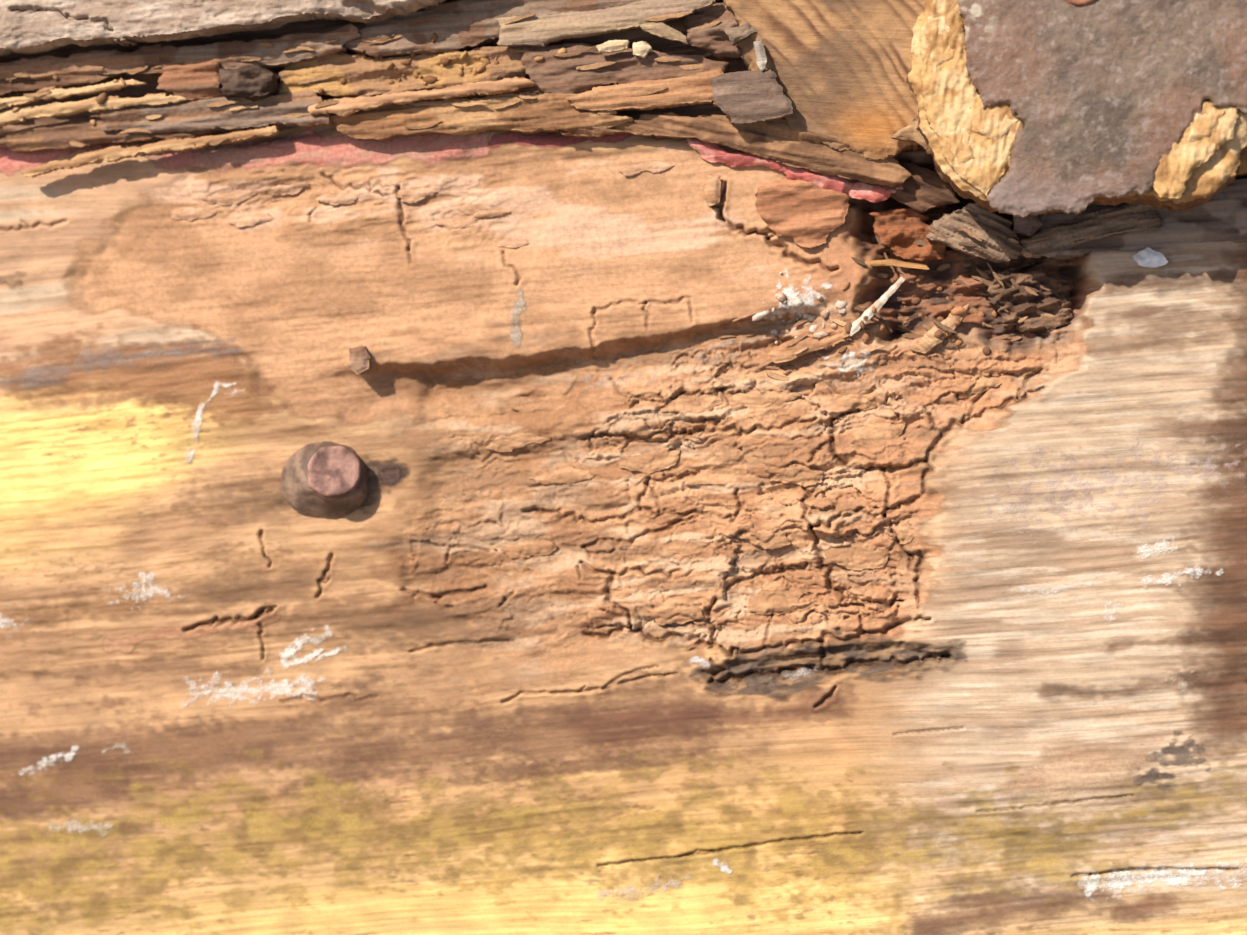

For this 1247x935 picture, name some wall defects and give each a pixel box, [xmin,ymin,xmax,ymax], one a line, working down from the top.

spalling [919,0,1024,197]
peeling [144,130,633,170]
peeling [686,138,904,203]
spalling [1153,99,1239,200]
corrosion [358,460,409,508]
crack [589,387,753,447]
crack [828,375,1032,508]
crack [714,487,841,603]
damp [1139,347,1247,739]
crack [715,640,896,689]
damp [0,691,944,923]
damp [1129,732,1220,819]